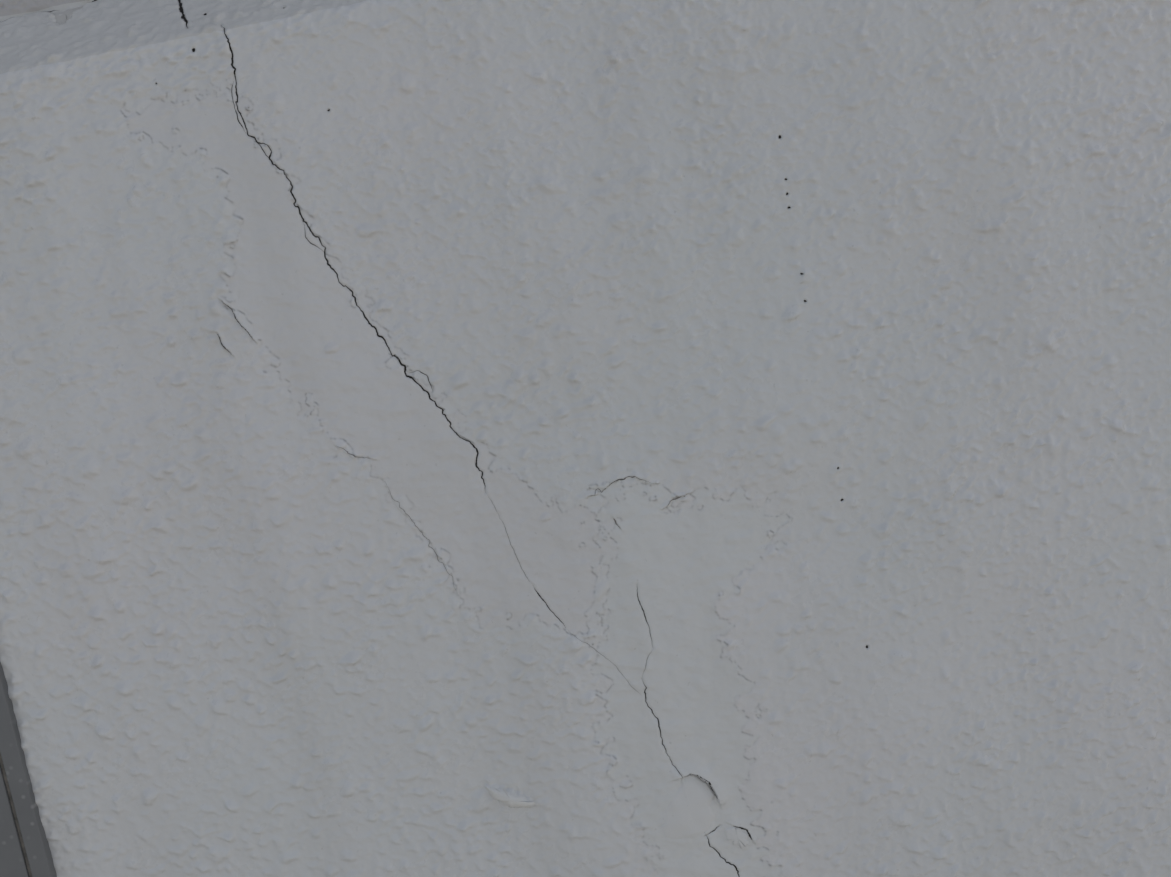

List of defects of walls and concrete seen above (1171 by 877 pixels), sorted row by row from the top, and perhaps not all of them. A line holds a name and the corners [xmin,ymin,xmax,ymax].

crack [178,0,188,28]
crack [223,27,683,778]
crack [706,826,740,877]